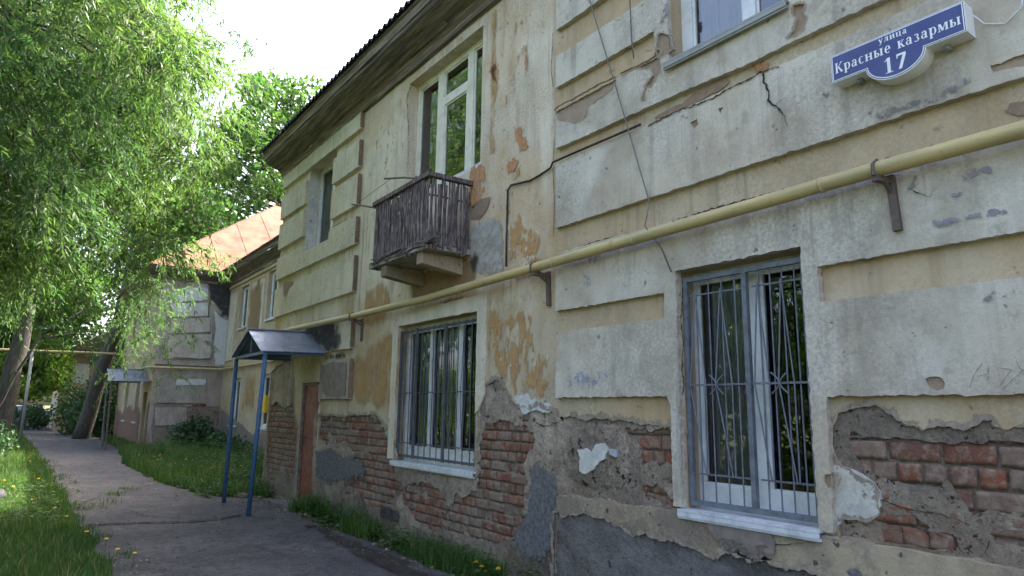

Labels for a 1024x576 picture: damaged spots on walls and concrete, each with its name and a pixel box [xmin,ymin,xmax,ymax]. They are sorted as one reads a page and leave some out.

peeling [507,127,528,176]
flaking render [555,3,676,123]
crack [648,66,791,127]
flaking render [785,1,807,39]
peeling [469,164,540,261]
flaking render [114,359,298,499]
flaking render [311,311,834,576]
flaking render [824,399,1024,569]